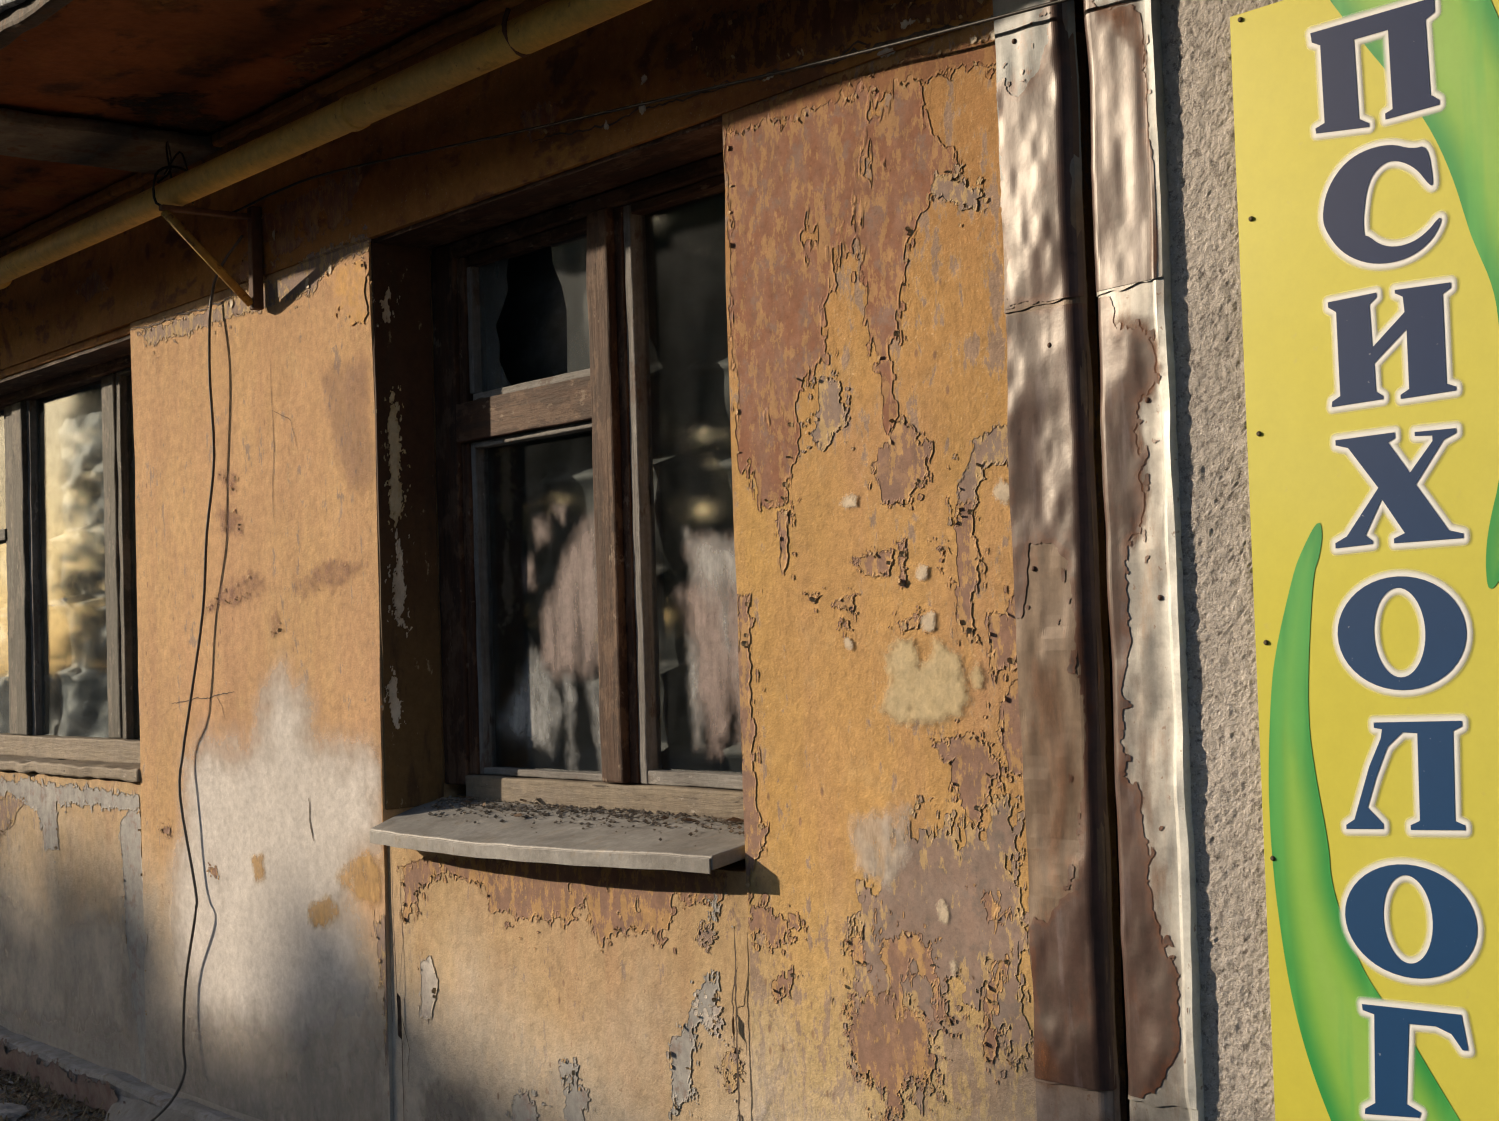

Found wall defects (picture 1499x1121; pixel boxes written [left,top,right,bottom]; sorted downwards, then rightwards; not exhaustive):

peeling [137,225,400,358]
corrosion [1120,321,1161,398]
peeling [384,385,414,638]
peeling [722,0,1188,1121]
flaking render [0,774,172,863]
peeling [252,855,264,880]
peeling [341,588,807,1121]
peeling [308,898,339,927]
peeling [0,1038,126,1114]